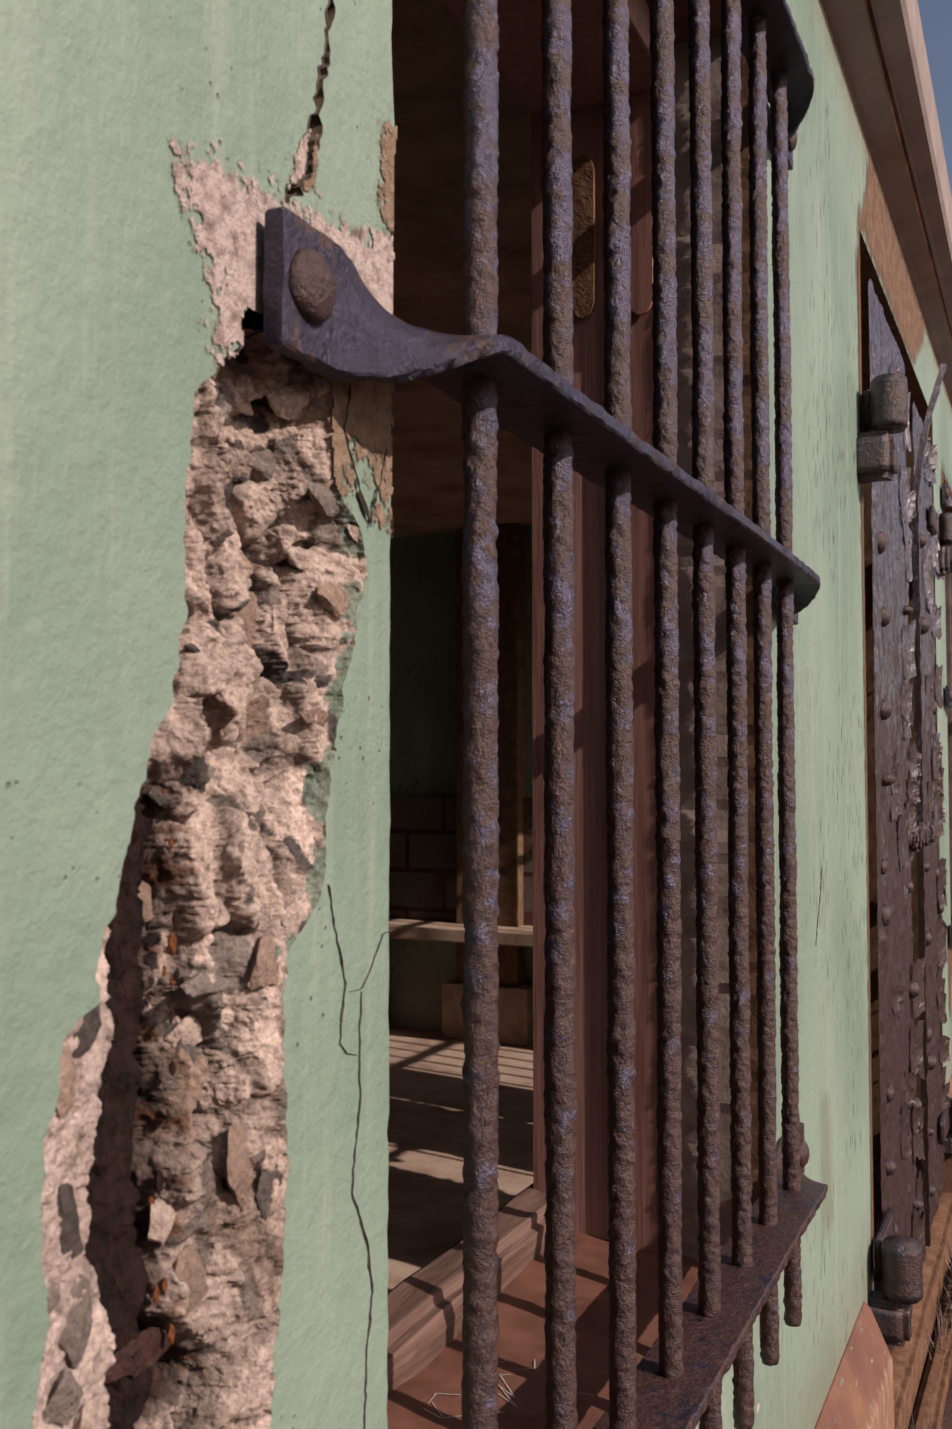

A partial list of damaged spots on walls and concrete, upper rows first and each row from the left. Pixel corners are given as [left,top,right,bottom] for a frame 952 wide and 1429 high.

crack [283,0,336,205]
spalling [32,119,397,1429]
crack [321,884,395,1429]